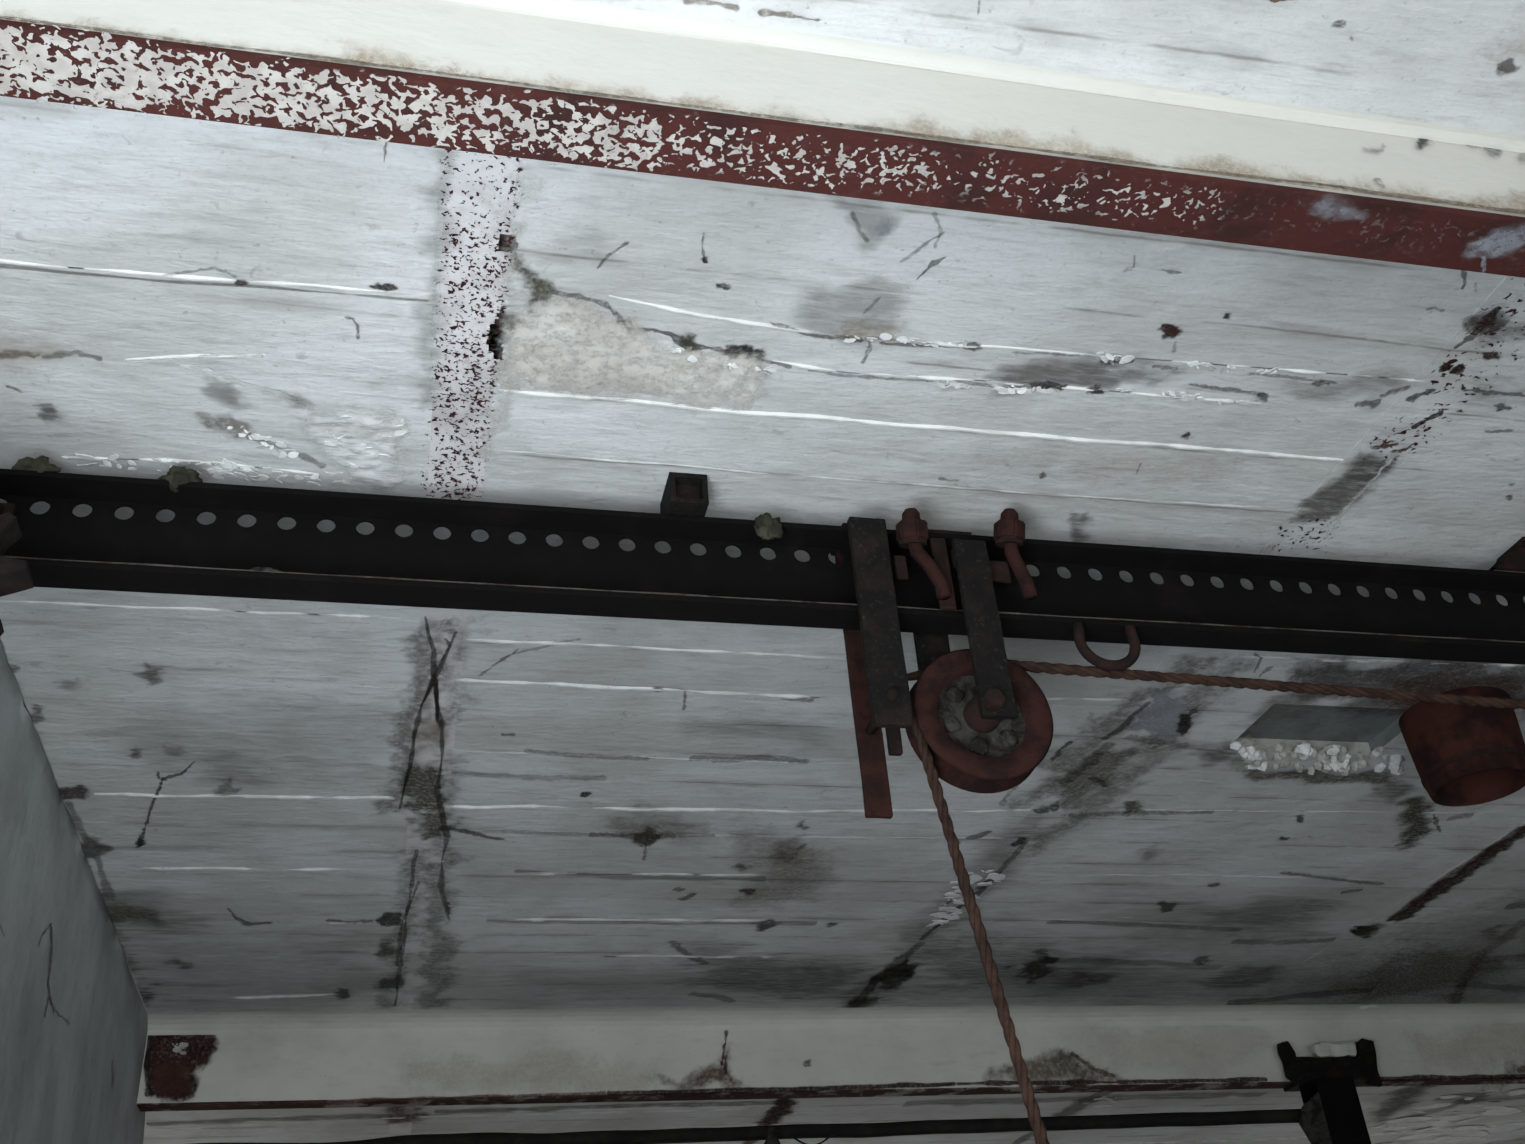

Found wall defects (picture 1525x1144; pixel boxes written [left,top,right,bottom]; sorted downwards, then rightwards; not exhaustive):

peeling [0,23,1221,500]
damp [1272,455,1395,553]
crack [135,762,194,848]
crack [326,618,504,1006]
spalling [1205,739,1405,784]
damp [1158,902,1176,912]
crack [40,923,54,1017]
corrosion [143,1030,1267,1144]
corrosion [1375,1067,1525,1121]